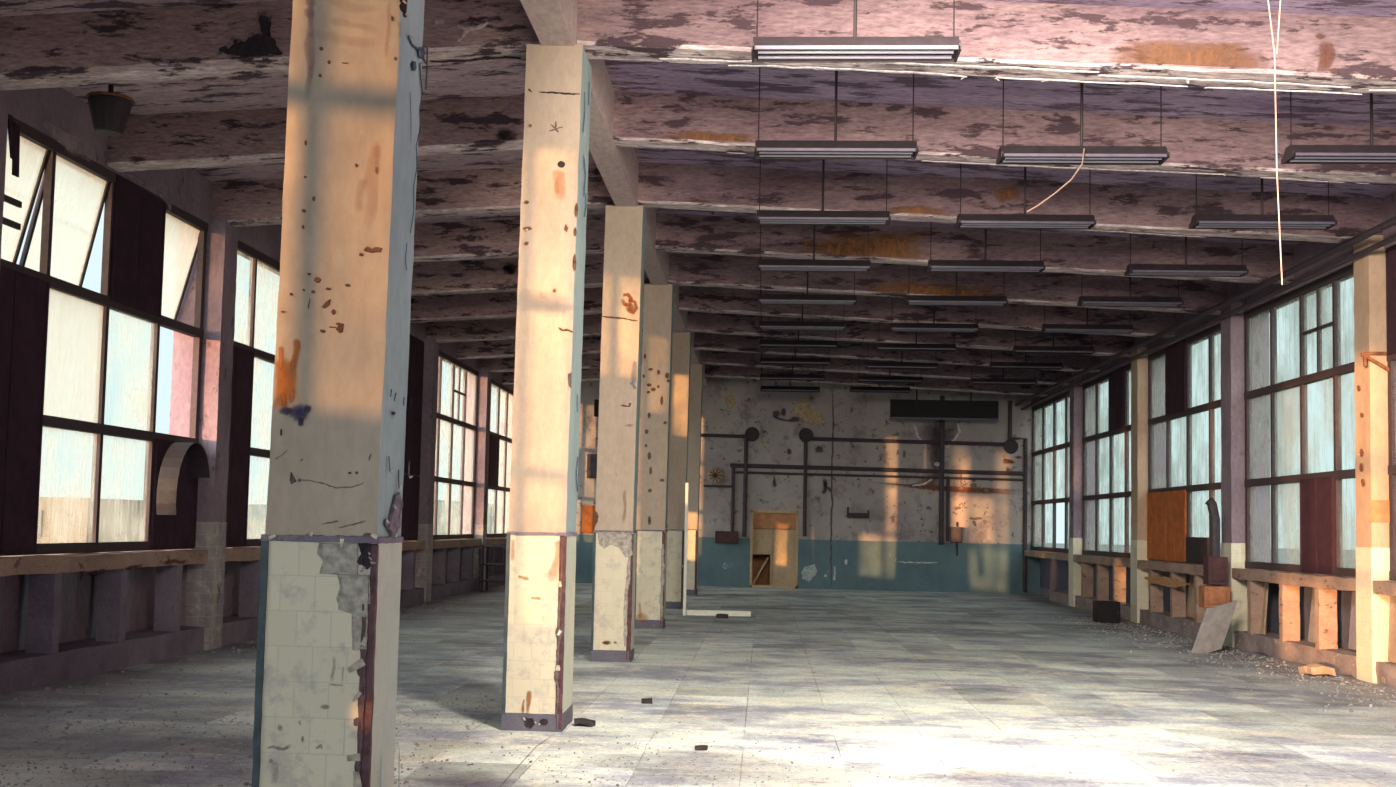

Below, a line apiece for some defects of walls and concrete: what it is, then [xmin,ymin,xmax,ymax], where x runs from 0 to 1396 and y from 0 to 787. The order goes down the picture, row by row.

spalling [218,11,283,58]
rust [275,340,300,406]
peeling [306,456,413,787]